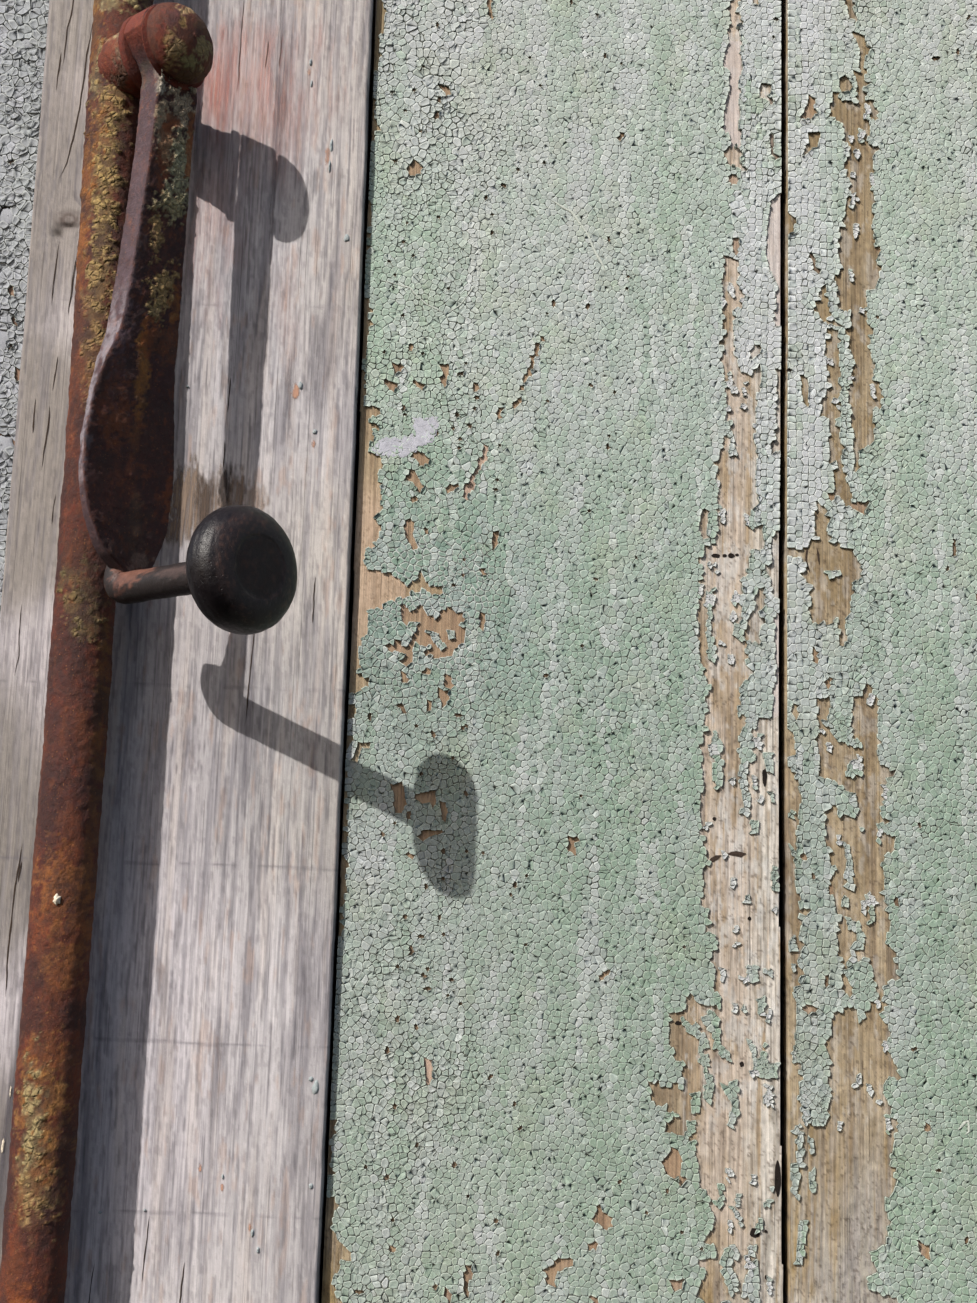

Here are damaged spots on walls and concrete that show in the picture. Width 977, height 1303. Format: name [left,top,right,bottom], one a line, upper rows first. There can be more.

peeling [496,336,545,419]
leakage [166,456,262,542]
peeling [348,298,487,730]
peeling [445,444,501,501]
crack [805,547,820,572]
peeling [648,0,901,1303]
peeling [381,772,468,854]
crack [710,851,746,862]
peeling [321,1116,364,1303]
peeling [587,1204,613,1250]
peeling [432,1265,473,1303]
peeling [542,1253,573,1287]